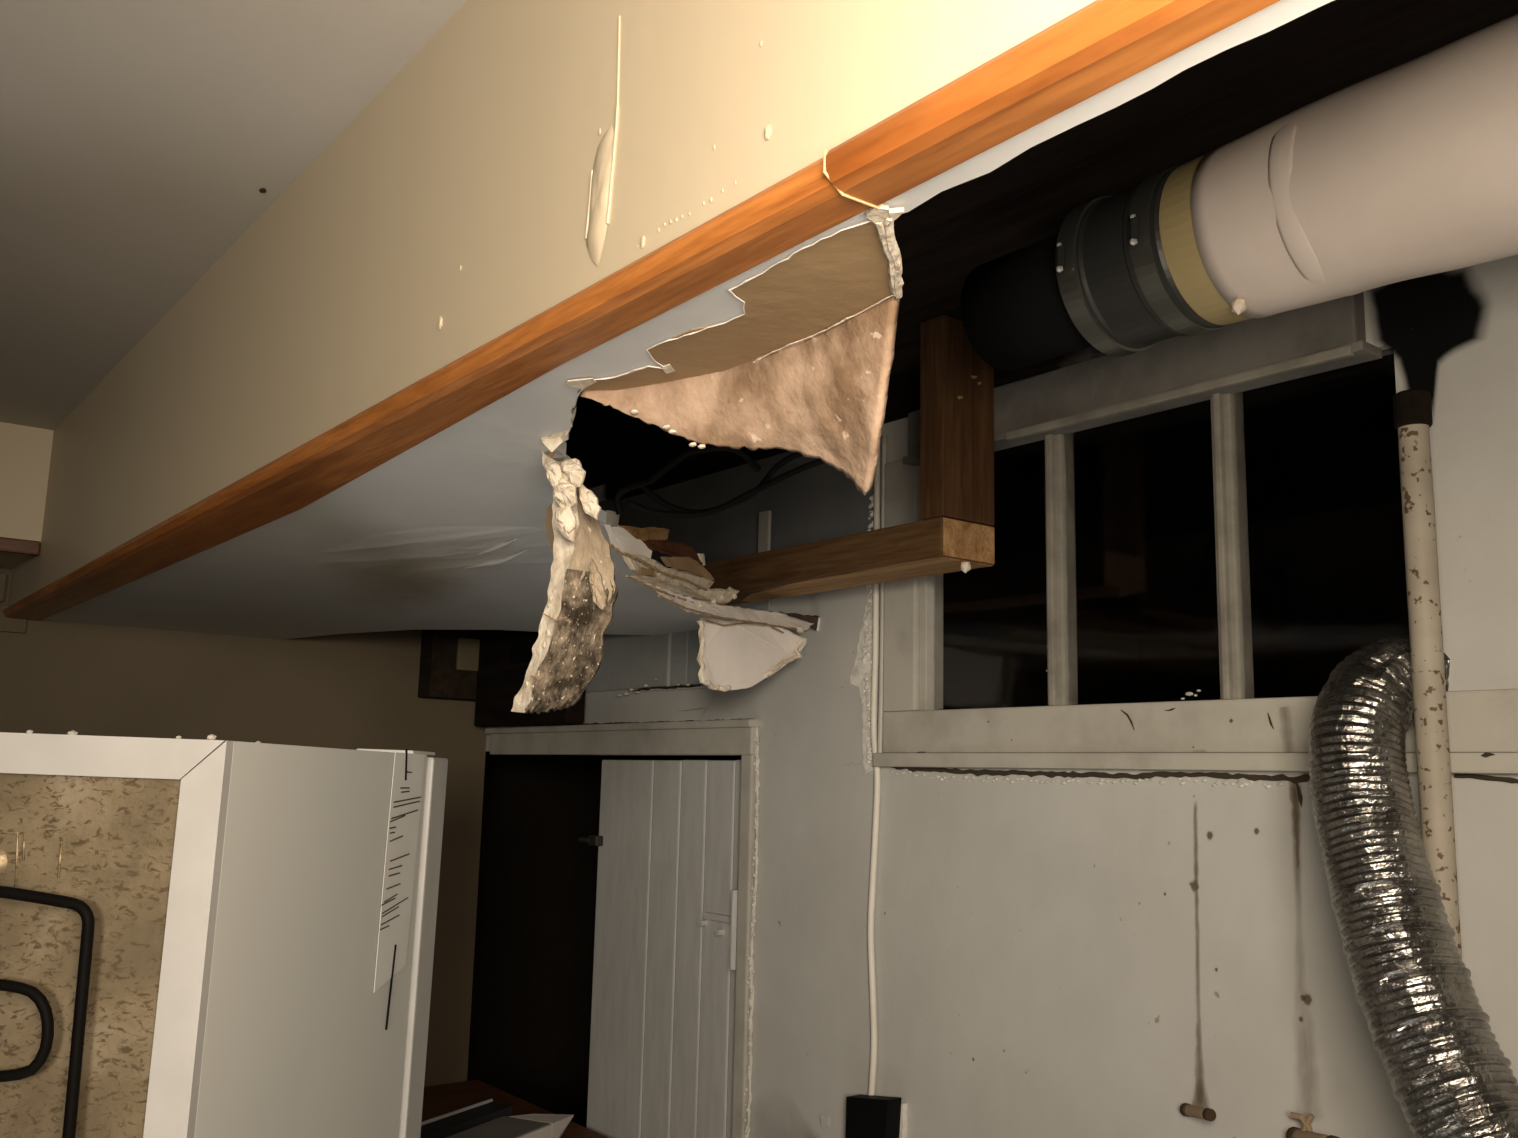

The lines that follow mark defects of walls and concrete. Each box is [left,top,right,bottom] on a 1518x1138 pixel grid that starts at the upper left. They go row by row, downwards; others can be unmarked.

peeling [541,204,904,459]
flaking render [613,679,709,698]